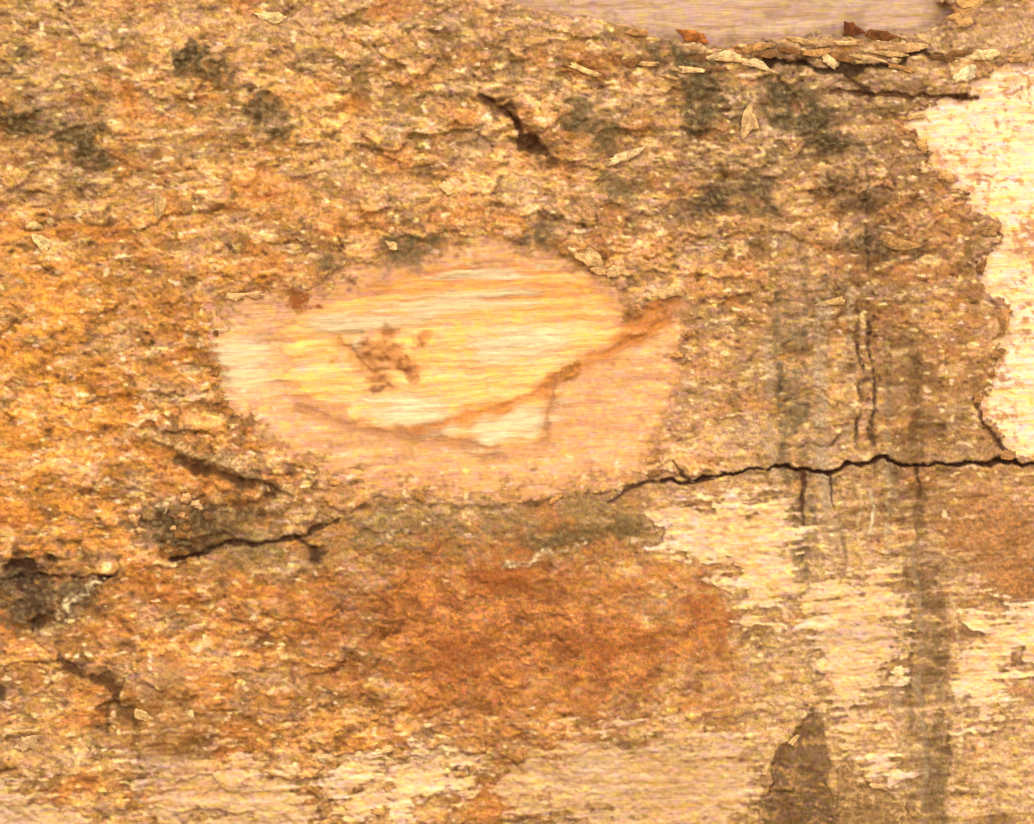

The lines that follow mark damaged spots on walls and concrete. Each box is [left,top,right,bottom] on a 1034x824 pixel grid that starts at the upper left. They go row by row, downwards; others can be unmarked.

spalling [478,93,645,170]
peeling [506,0,1034,465]
leakage [815,170,890,212]
leakage [837,228,932,269]
peeling [128,493,216,541]
crack [169,522,327,564]
spalling [151,231,694,504]
crack [525,499,541,507]
leakage [765,284,831,518]
crack [607,398,1034,538]
leakage [846,292,895,458]
rust [291,528,739,739]